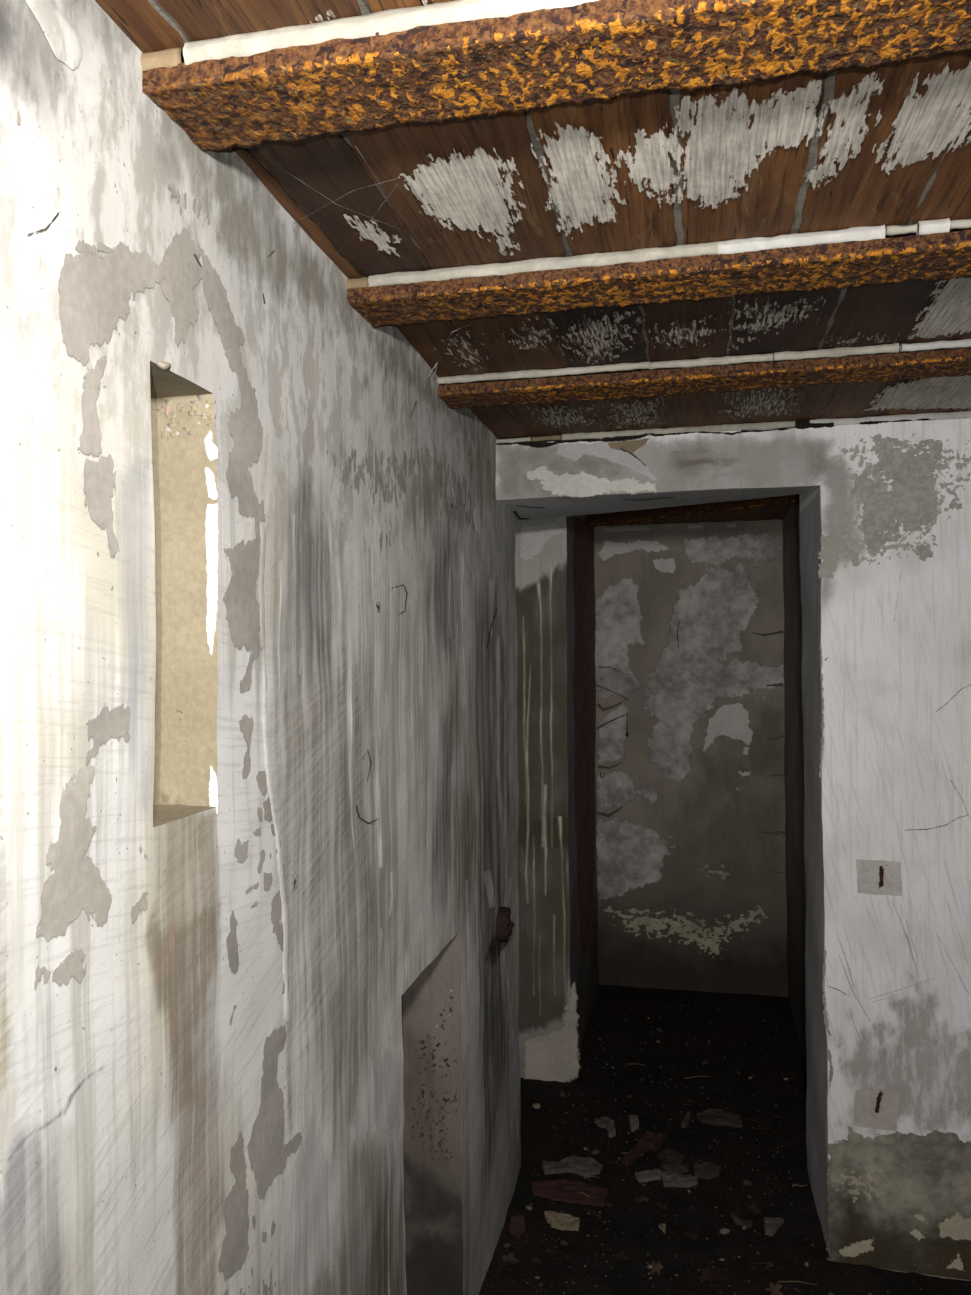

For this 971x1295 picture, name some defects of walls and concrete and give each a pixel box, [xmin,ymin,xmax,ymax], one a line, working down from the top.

peeling [399,147,526,255]
peeling [530,122,683,239]
peeling [805,61,971,191]
peeling [58,182,265,693]
peeling [36,703,130,941]
damp [276,483,372,1055]
damp [6,1139,39,1241]
damp [147,817,219,1295]
damp [327,1145,462,1295]
damp [411,983,457,1161]
peeling [826,996,971,1262]
damp [838,1199,971,1280]